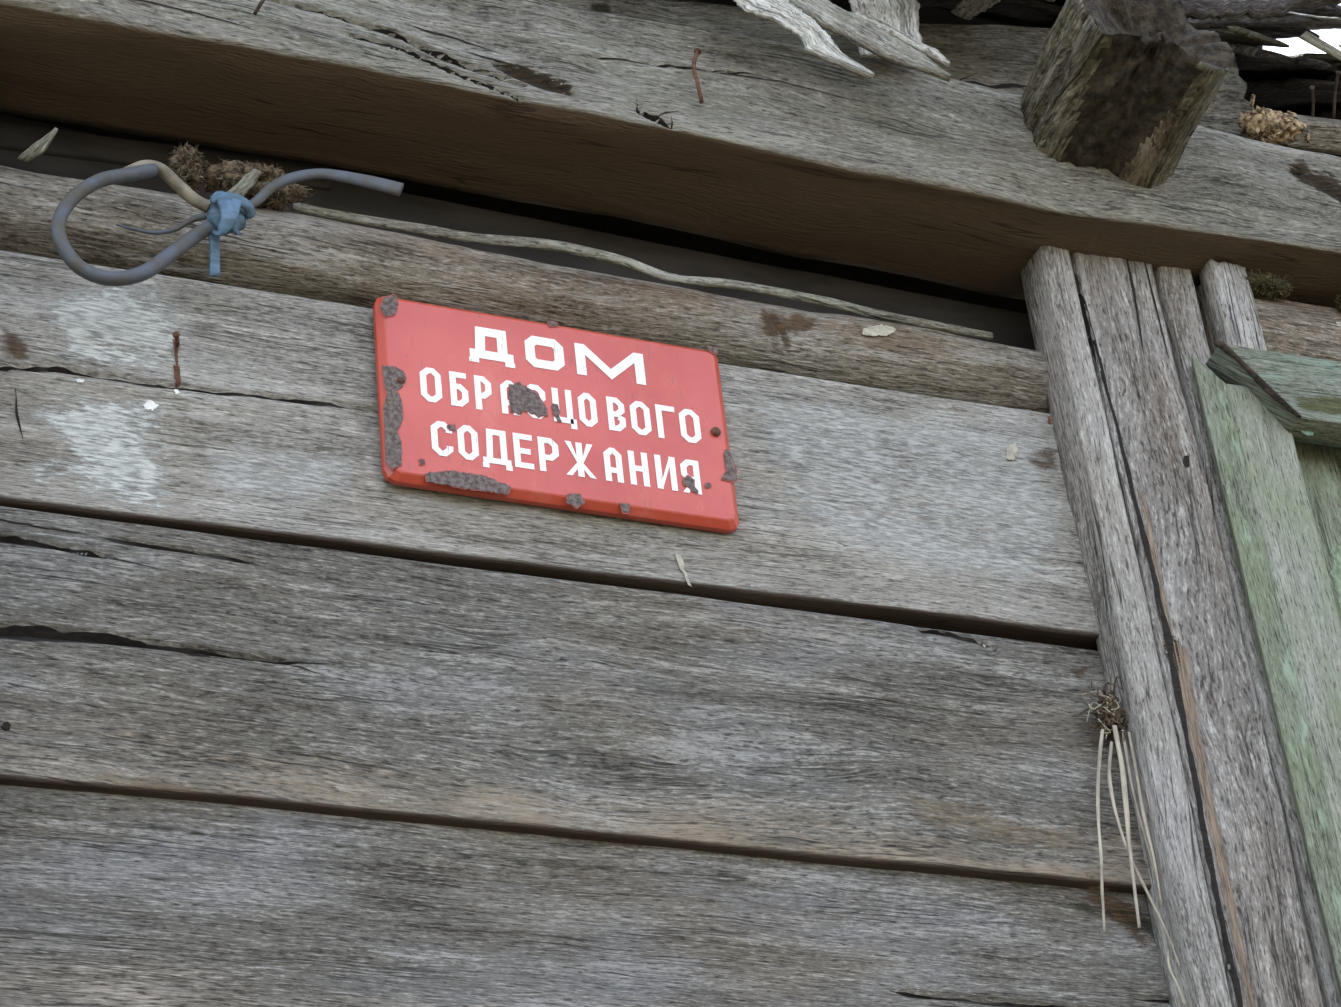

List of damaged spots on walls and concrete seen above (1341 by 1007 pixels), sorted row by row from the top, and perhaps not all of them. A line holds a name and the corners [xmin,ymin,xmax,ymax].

corrosion [173,339,181,389]
crack [0,625,335,675]
crack [889,990,1065,1007]